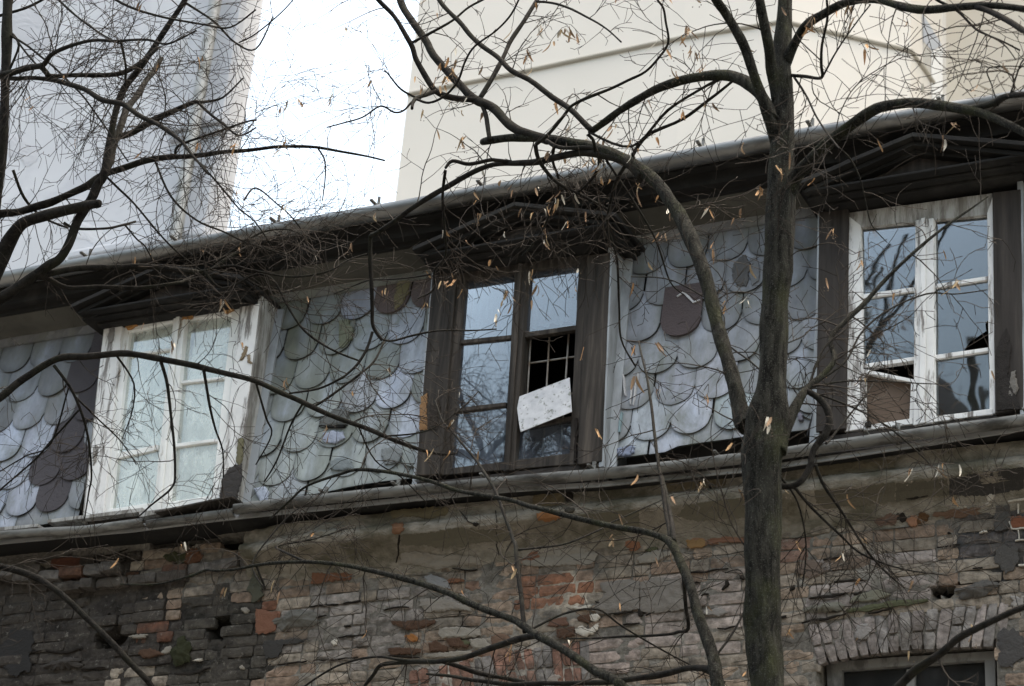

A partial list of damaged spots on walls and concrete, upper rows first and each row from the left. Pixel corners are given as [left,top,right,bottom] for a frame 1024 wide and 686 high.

spalling [874,512,929,527]
spalling [171,542,243,564]
flaking render [255,609,278,634]
spalling [391,619,436,630]
spalling [547,614,591,639]
spalling [388,637,469,655]